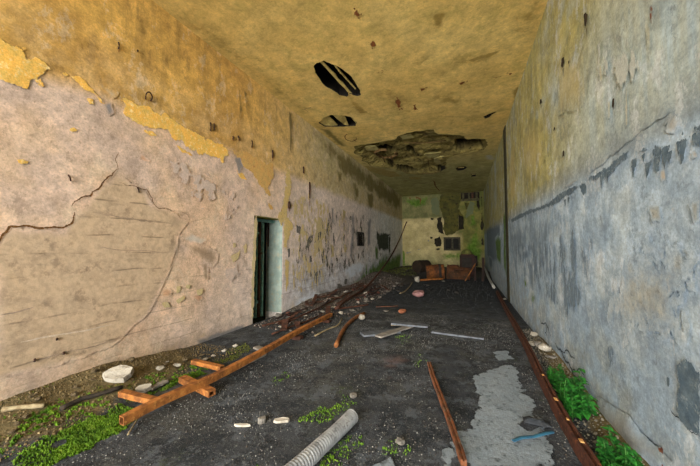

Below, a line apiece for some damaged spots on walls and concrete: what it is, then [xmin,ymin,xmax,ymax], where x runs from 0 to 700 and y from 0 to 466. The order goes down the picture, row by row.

peeling [0,38,51,89]
peeling [63,72,114,116]
peeling [597,38,639,91]
crack [0,152,165,241]
peeling [122,96,371,303]
spalling [354,129,488,175]
peeling [511,124,700,223]
flaking render [607,234,700,347]
peeling [666,359,700,436]